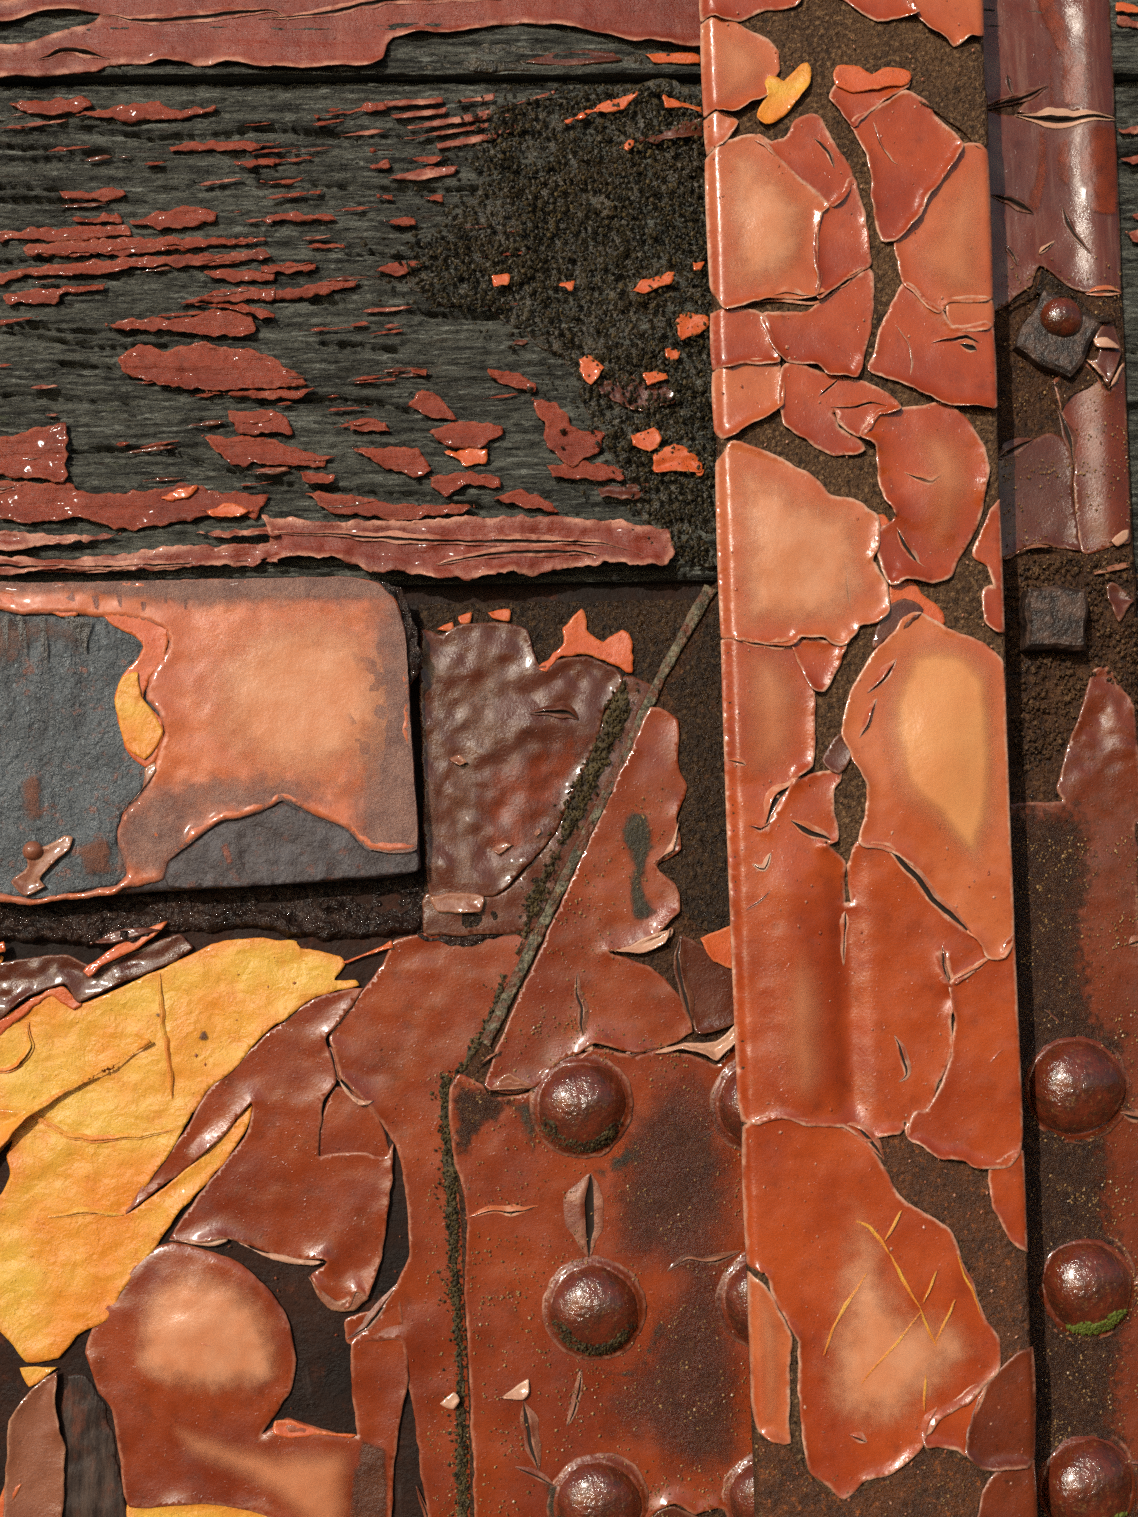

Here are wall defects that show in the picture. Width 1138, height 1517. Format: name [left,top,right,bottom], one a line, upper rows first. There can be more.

corrosion [1039,0,1090,104]
peeling [1115,2,1138,29]
corrosion [1029,126,1117,213]
crack [743,267,863,306]
crack [818,375,887,411]
crack [896,326,980,374]
spalling [0,90,675,899]
crack [897,528,927,568]
peeling [1093,530,1134,622]
corrosion [488,742,585,859]
peeling [415,0,1124,1517]
peeling [0,934,409,1517]